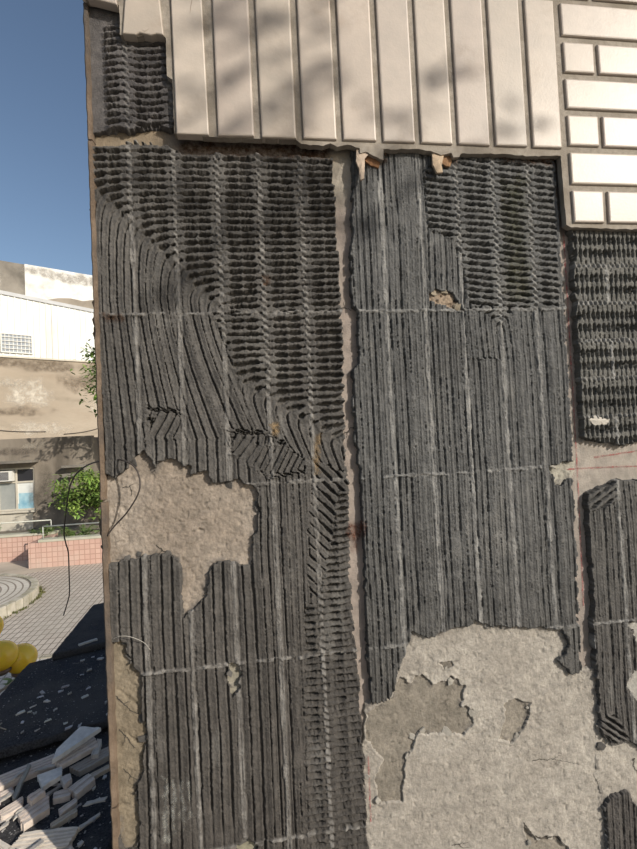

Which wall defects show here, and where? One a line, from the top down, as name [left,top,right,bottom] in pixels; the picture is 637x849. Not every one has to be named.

peeling [355,149,380,181]
peeling [431,153,452,174]
spalling [429,289,462,311]
peeling [589,415,609,425]
spalling [549,460,575,485]
spalling [101,451,260,616]
spalling [226,663,242,695]
peeling [16,690,57,734]
spalling [106,640,147,848]
spalling [361,620,637,849]
spalling [236,838,257,849]